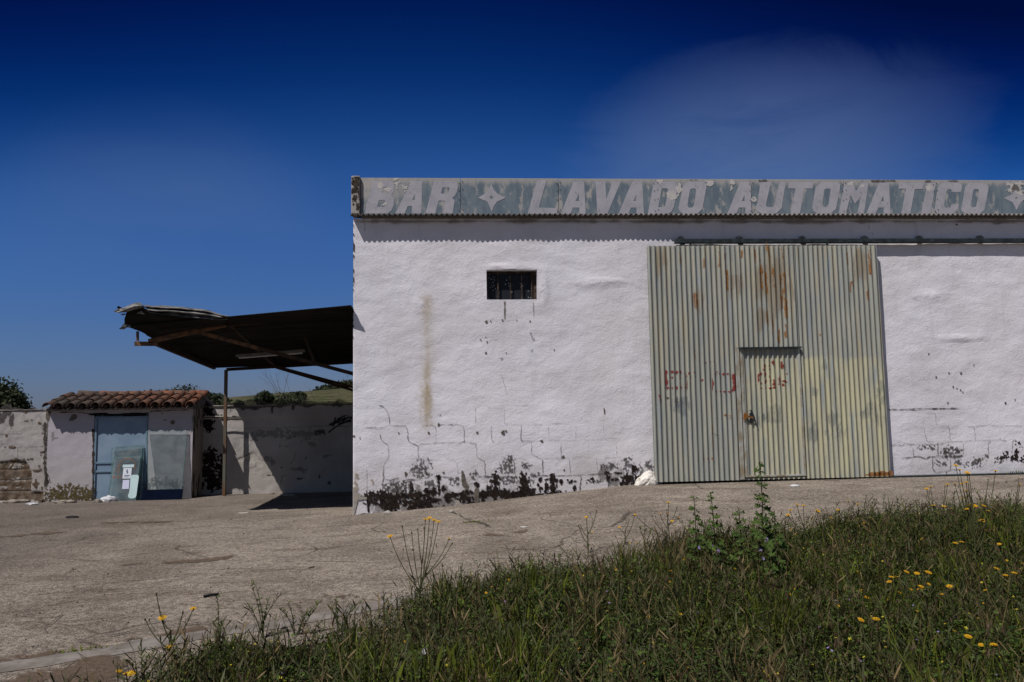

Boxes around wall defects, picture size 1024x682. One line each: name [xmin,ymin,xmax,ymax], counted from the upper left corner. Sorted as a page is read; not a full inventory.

peeling [1006,180,1024,196]
rust [741,245,788,343]
flaking render [0,407,51,501]
crack [361,378,617,497]
damp [353,452,654,514]
mould [917,440,1024,469]